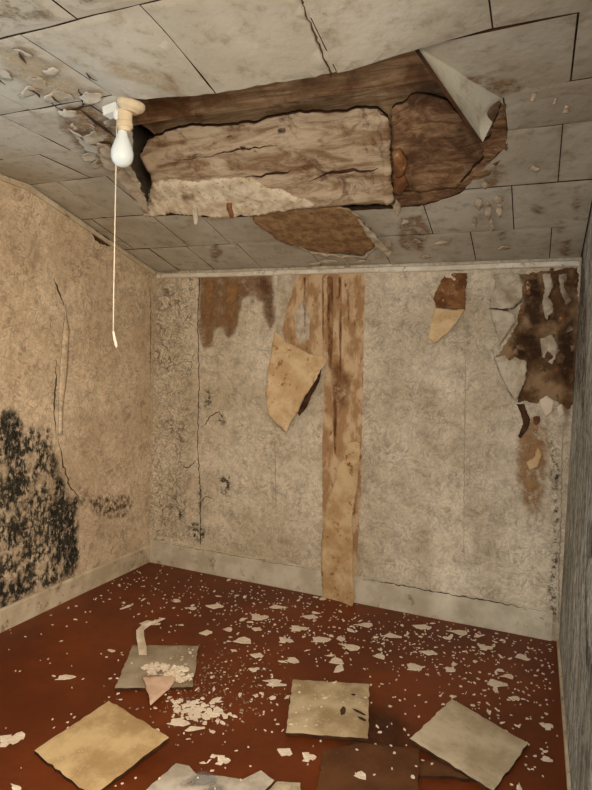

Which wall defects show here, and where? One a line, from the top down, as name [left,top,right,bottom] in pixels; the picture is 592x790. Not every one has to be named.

peeling [0,48,116,169]
crack [301,0,332,77]
spalling [489,267,579,425]
leakage [0,410,79,608]
crack [53,360,81,501]
leakage [519,422,560,540]